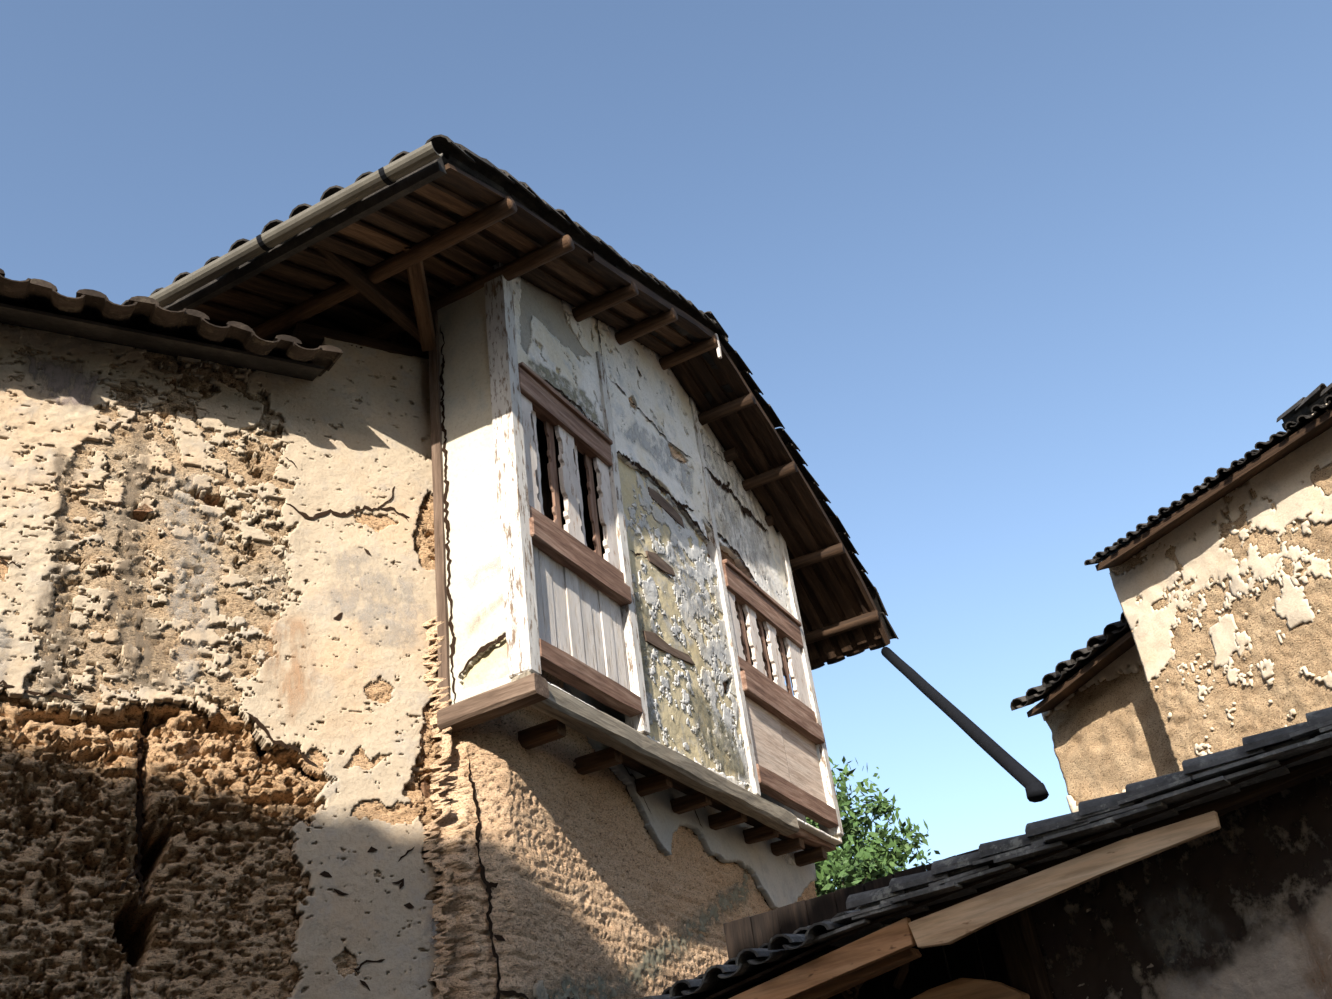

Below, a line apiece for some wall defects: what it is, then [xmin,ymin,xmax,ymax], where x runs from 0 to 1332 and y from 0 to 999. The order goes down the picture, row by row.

peeling [513,278,598,360]
crack [286,486,424,525]
spalling [1302,463,1332,496]
spalling [0,324,443,999]
peeling [462,637,509,689]
peeling [617,445,751,790]
spalling [1046,481,1332,806]
crack [118,713,149,900]
crack [467,749,529,999]